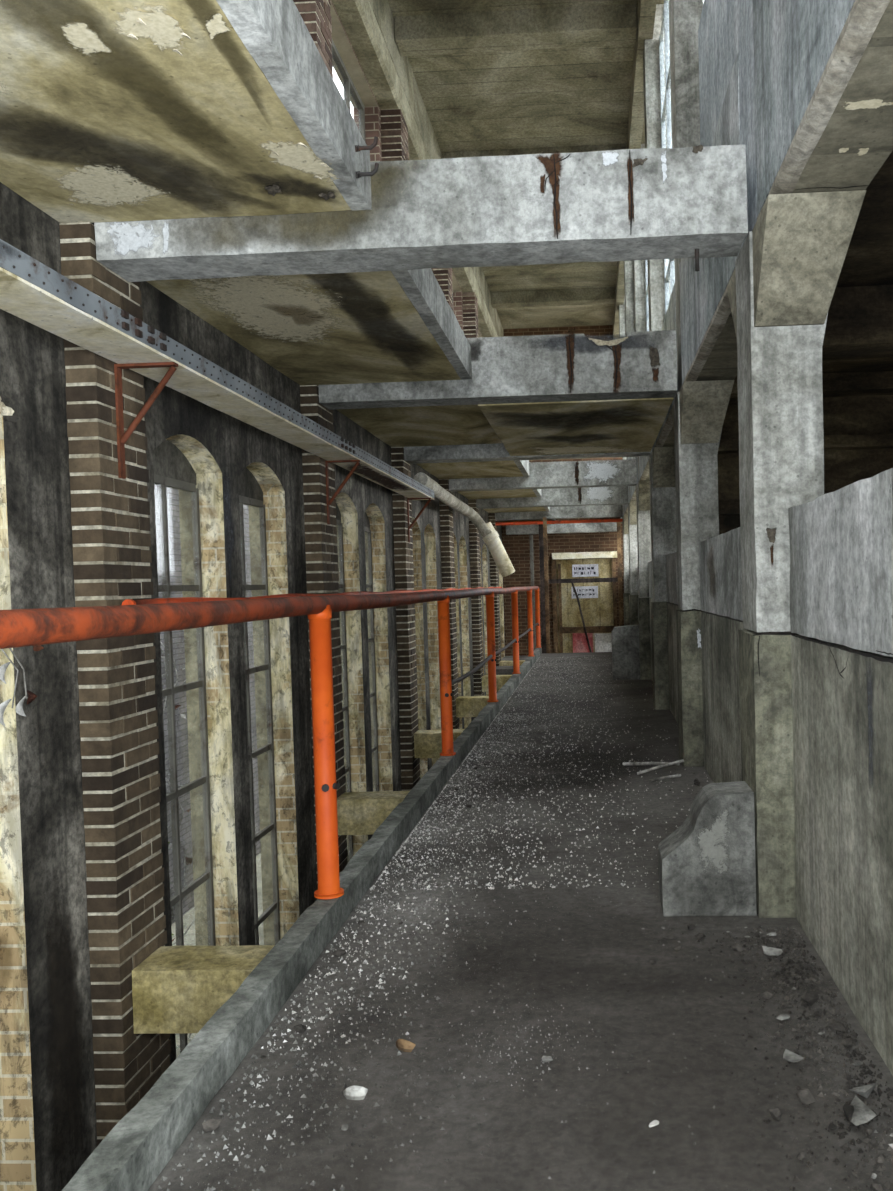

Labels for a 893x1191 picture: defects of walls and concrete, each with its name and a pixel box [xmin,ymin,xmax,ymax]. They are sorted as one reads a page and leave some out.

peeling [62,23,111,54]
peeling [115,5,191,56]
peeling [206,13,231,39]
water stain [0,113,396,242]
corrosion [536,152,563,193]